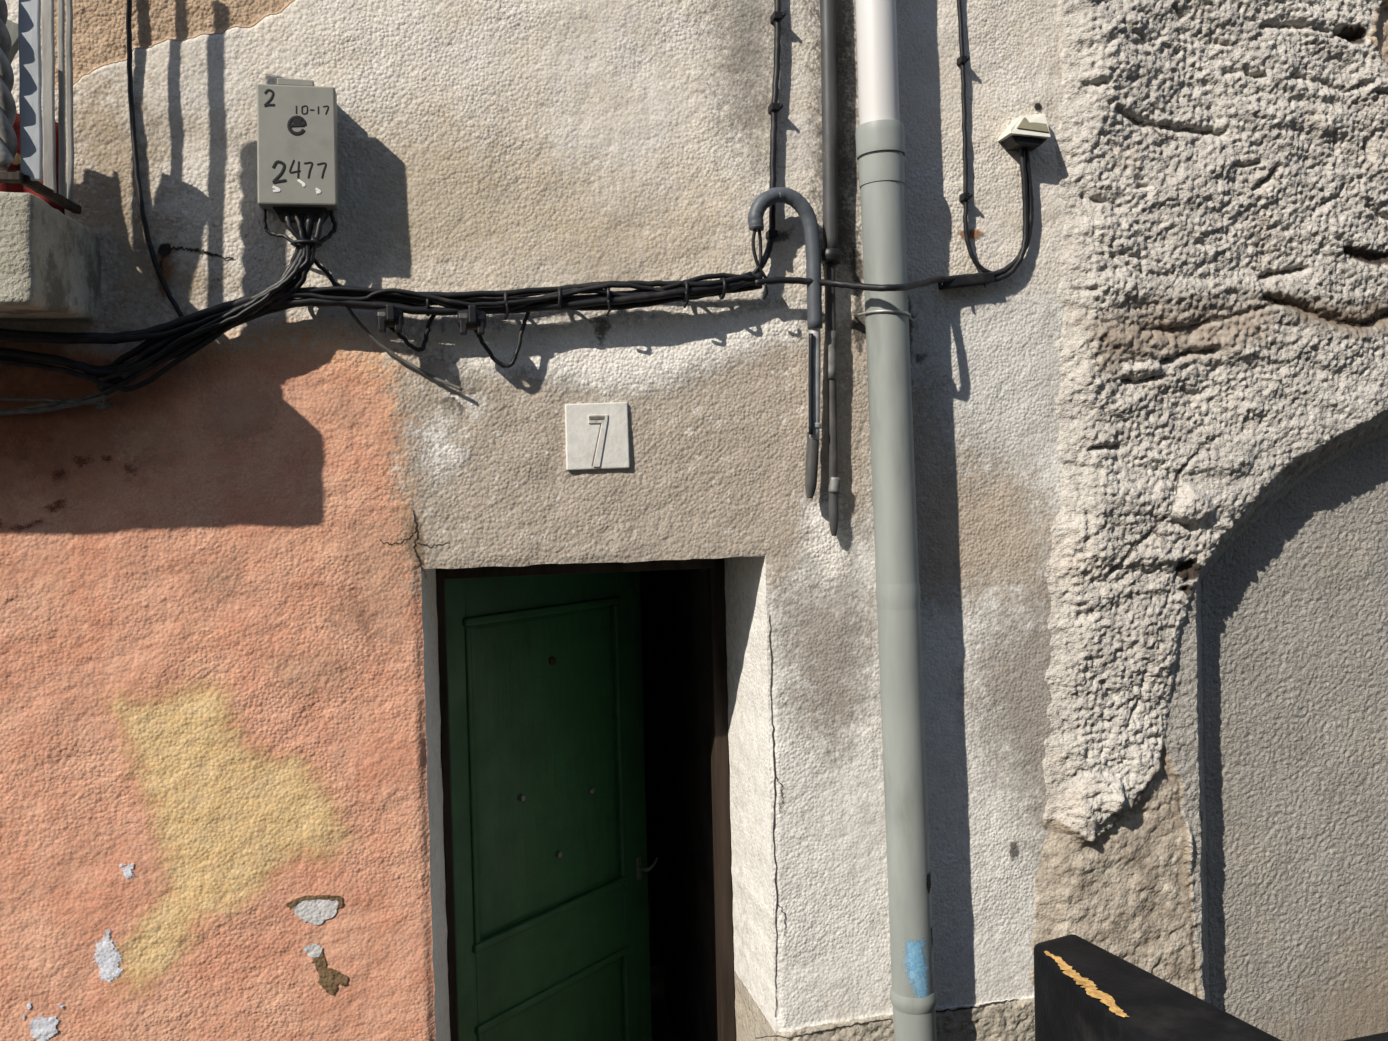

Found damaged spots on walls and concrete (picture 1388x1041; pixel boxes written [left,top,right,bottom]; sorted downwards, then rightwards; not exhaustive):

peeling [1338,1,1388,63]
crack [379,510,450,578]
peeling [92,682,349,987]
crack [755,615,891,1039]
peeling [1029,758,1201,998]
spalling [303,944,348,995]
peeling [21,1002,64,1041]
crack [936,999,1019,1012]